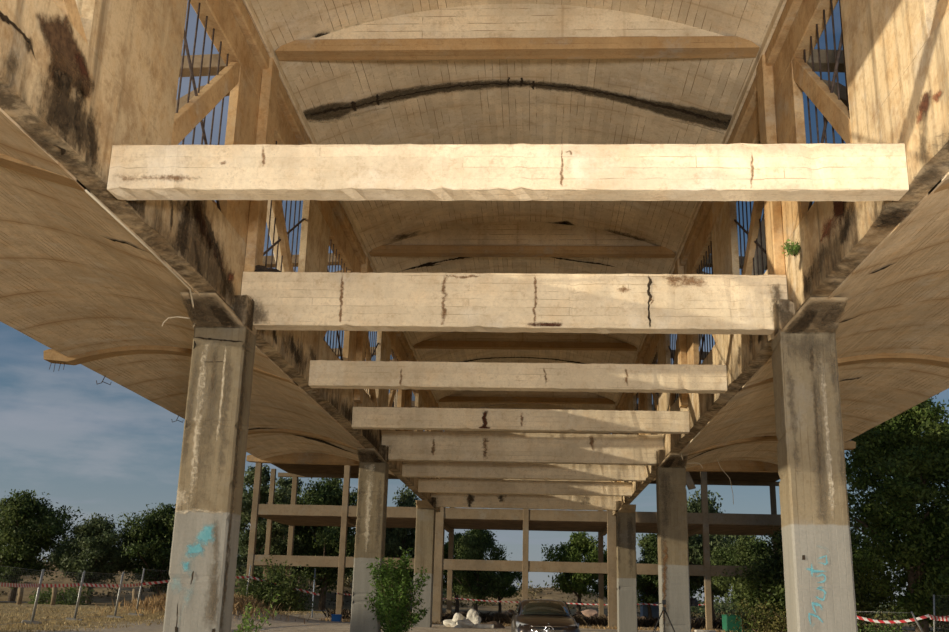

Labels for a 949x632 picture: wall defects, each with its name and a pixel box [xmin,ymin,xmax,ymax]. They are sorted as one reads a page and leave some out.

water stain [24,78,99,175]
crack [303,77,732,132]
rust [916,90,942,158]
water stain [918,166,938,185]
water stain [874,205,912,228]
crack [550,257,614,267]
crack [337,278,345,321]
crack [399,257,477,324]
crack [530,278,562,327]
crack [646,276,654,327]
crack [479,411,490,457]